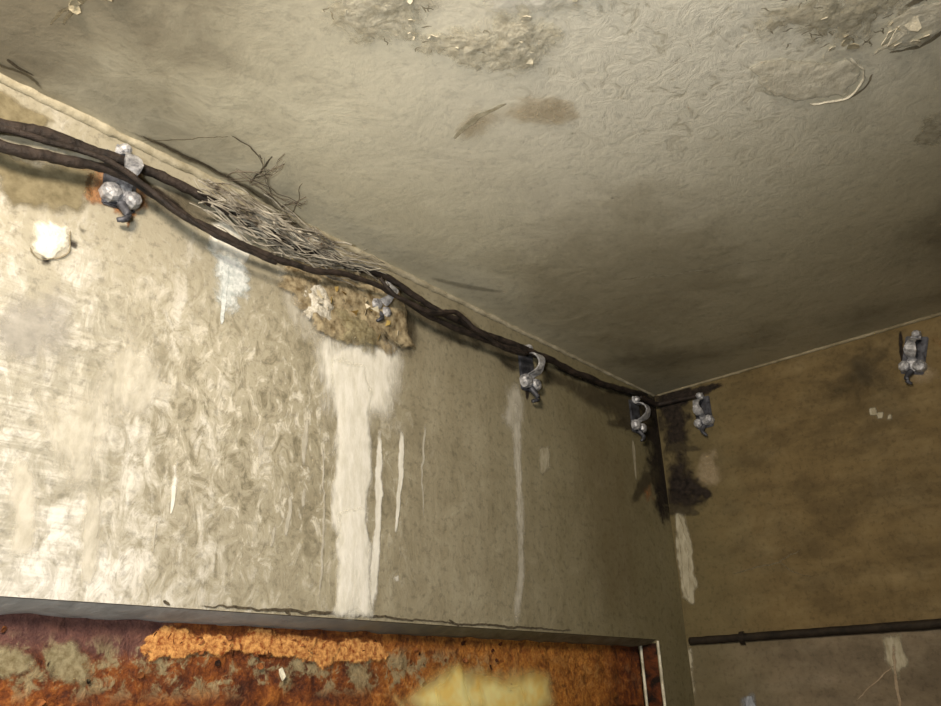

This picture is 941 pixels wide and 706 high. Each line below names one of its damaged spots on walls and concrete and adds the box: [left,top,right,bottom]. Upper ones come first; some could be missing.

peeling [323,0,578,70]
spalling [751,0,941,106]
damp [270,218,481,617]
damp [544,367,721,604]
corrosion [140,625,389,670]
crack [857,635,908,706]